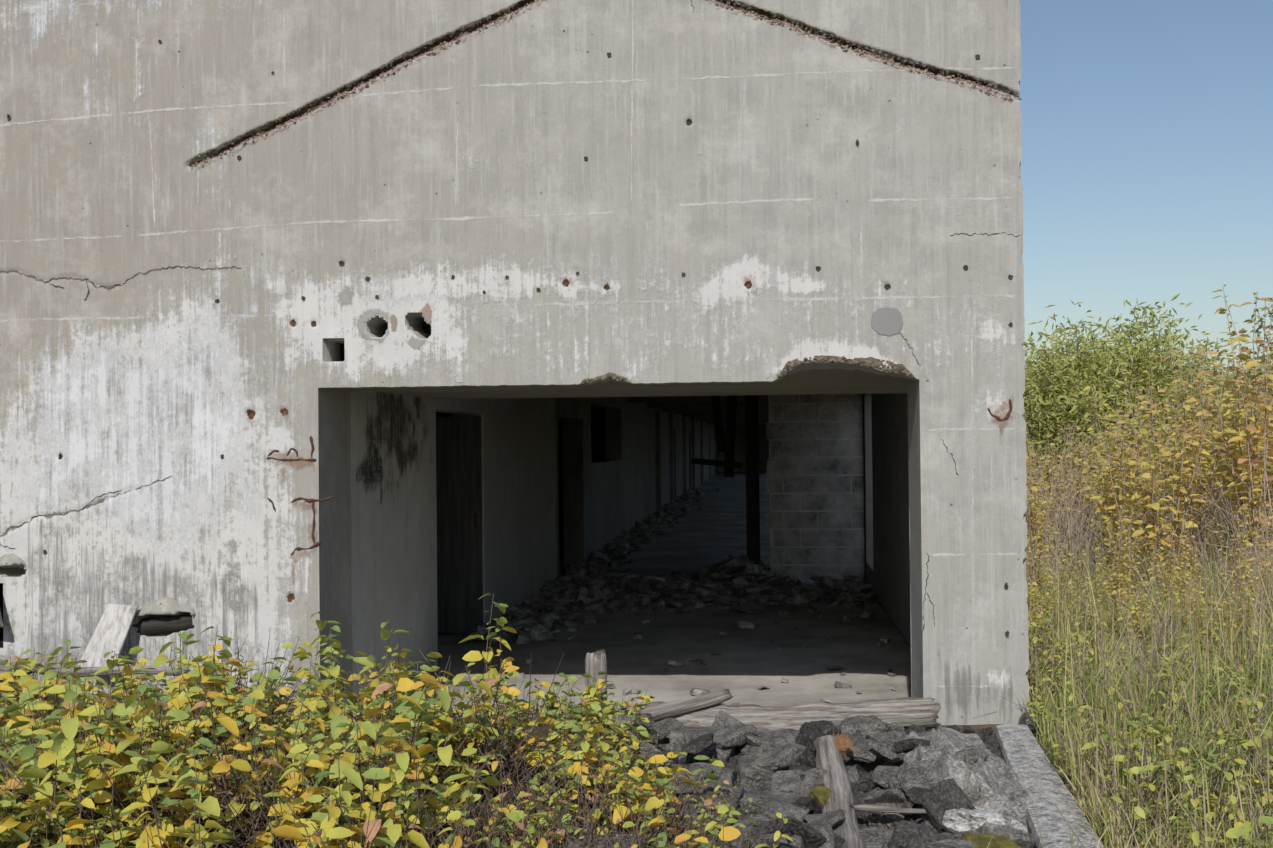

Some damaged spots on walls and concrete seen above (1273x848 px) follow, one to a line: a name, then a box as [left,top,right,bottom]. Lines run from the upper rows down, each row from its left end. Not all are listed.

crack [0,265,240,300]
spalling [421,303,432,322]
spalling [767,338,916,381]
damp [0,232,1016,719]
crack [0,476,171,549]